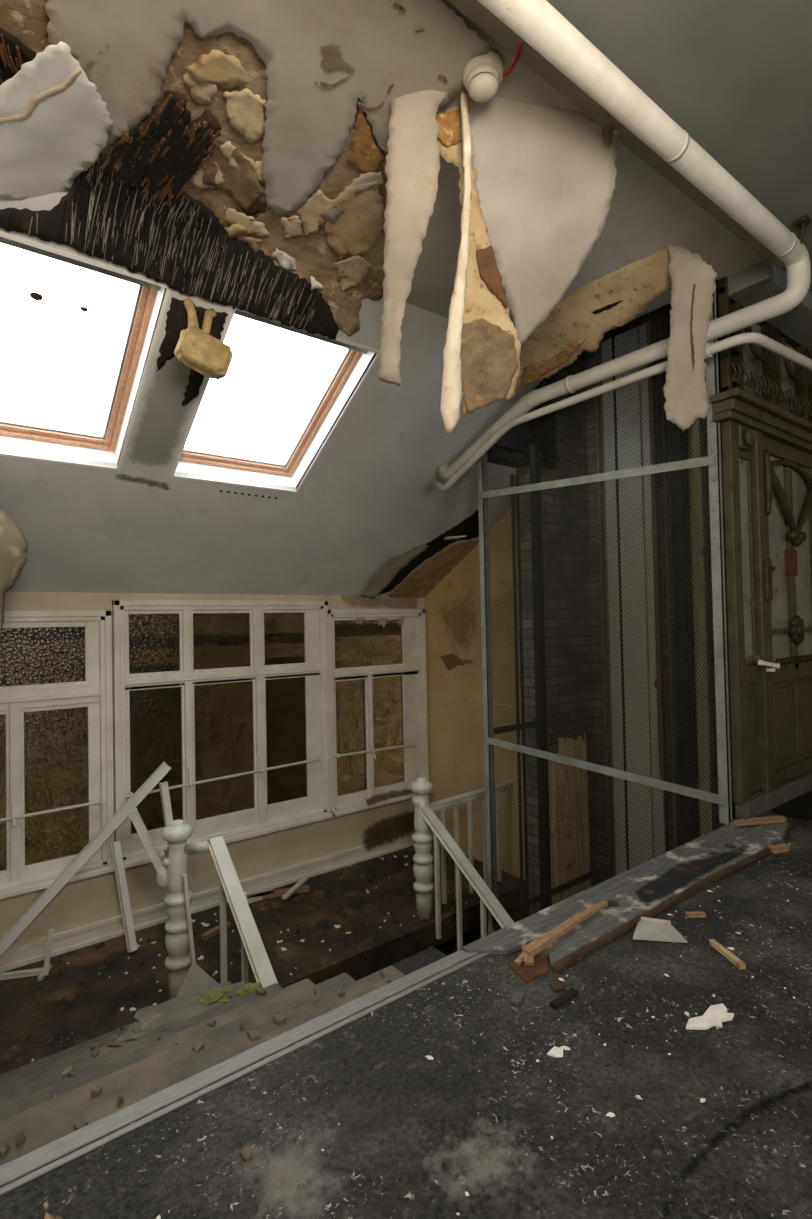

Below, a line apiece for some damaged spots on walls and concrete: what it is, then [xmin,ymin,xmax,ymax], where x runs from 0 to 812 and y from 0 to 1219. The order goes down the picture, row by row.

peeling [0,0,50,54]
peeling [137,22,388,337]